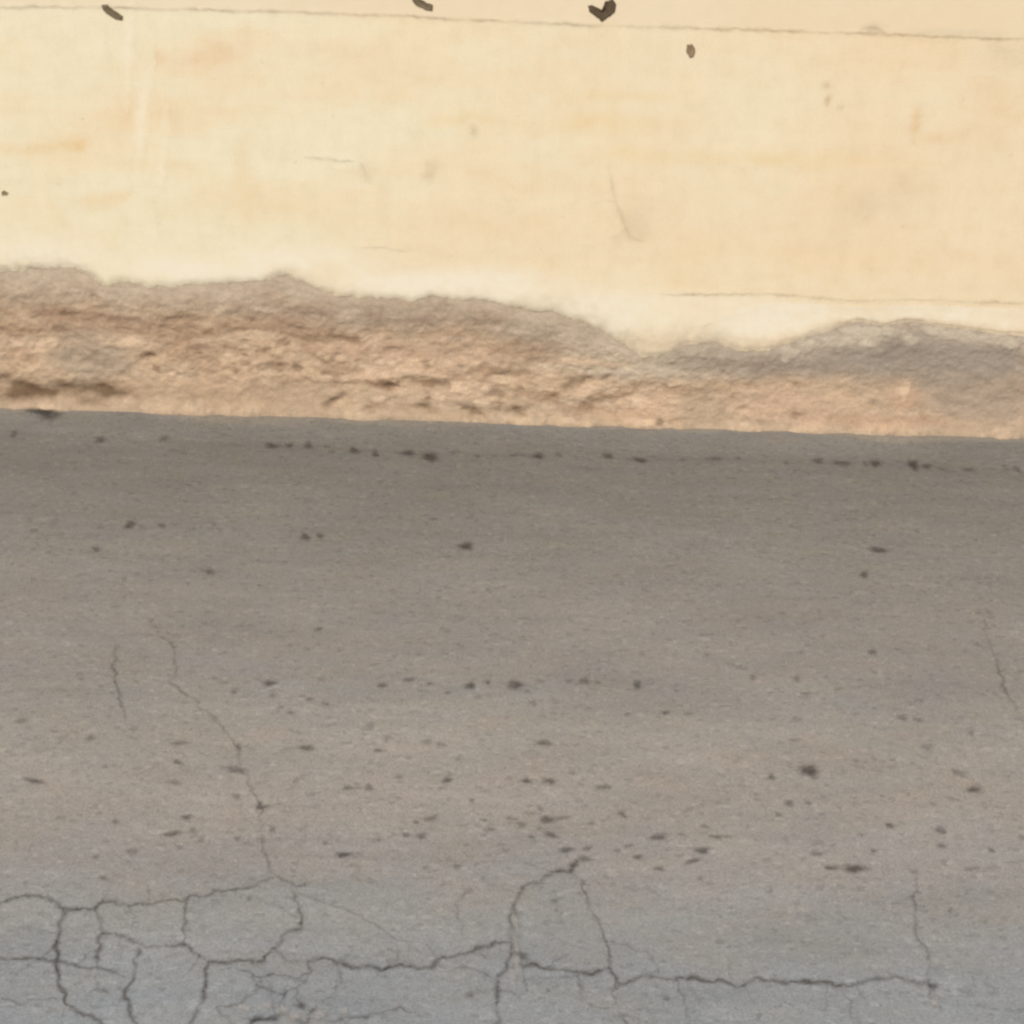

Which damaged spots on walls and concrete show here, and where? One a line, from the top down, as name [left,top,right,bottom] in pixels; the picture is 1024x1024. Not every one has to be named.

spalling [0,268,1024,439]